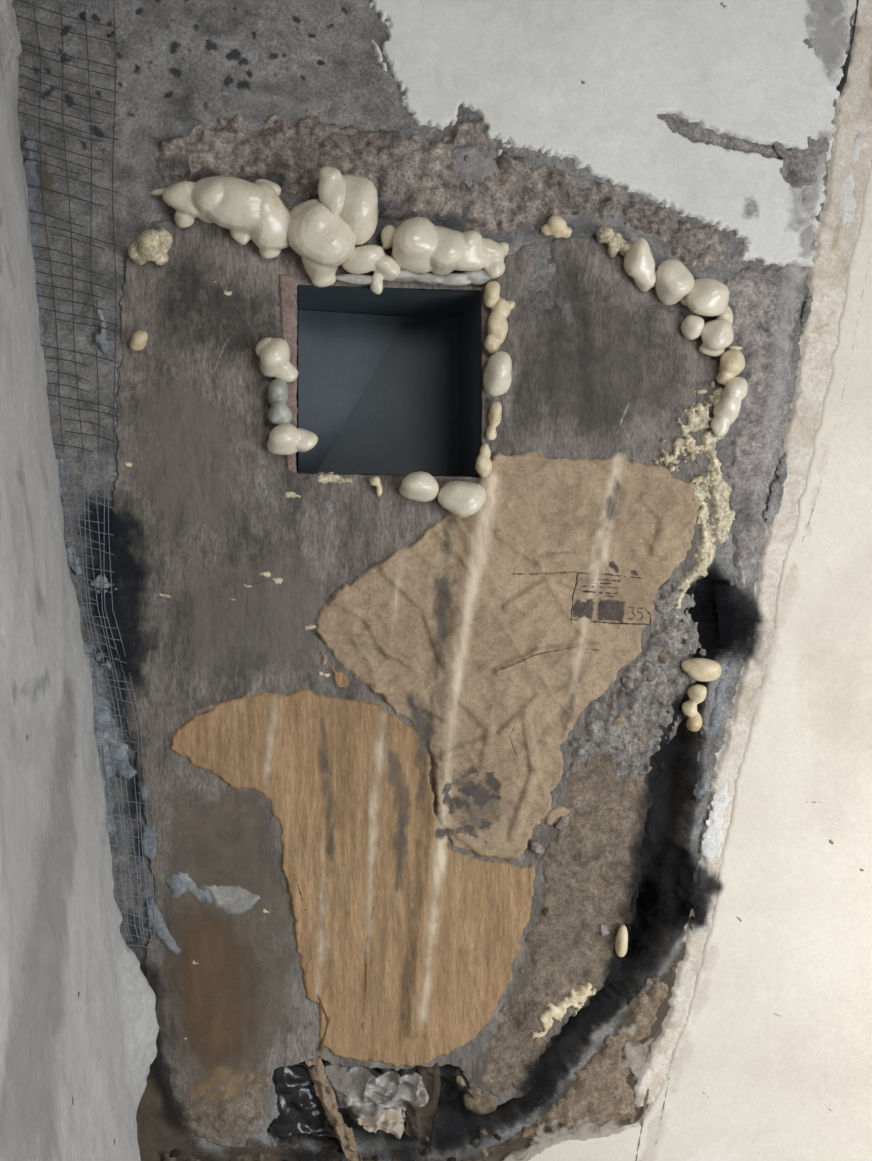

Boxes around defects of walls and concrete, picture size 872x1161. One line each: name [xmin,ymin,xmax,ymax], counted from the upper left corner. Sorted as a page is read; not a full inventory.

spalling [61,11,114,37]
flaking render [154,0,872,878]
leakage [767,266,803,416]
leakage [82,499,150,817]
leakage [130,791,292,1119]
leakage [478,747,649,1105]
spalling [416,893,717,1161]